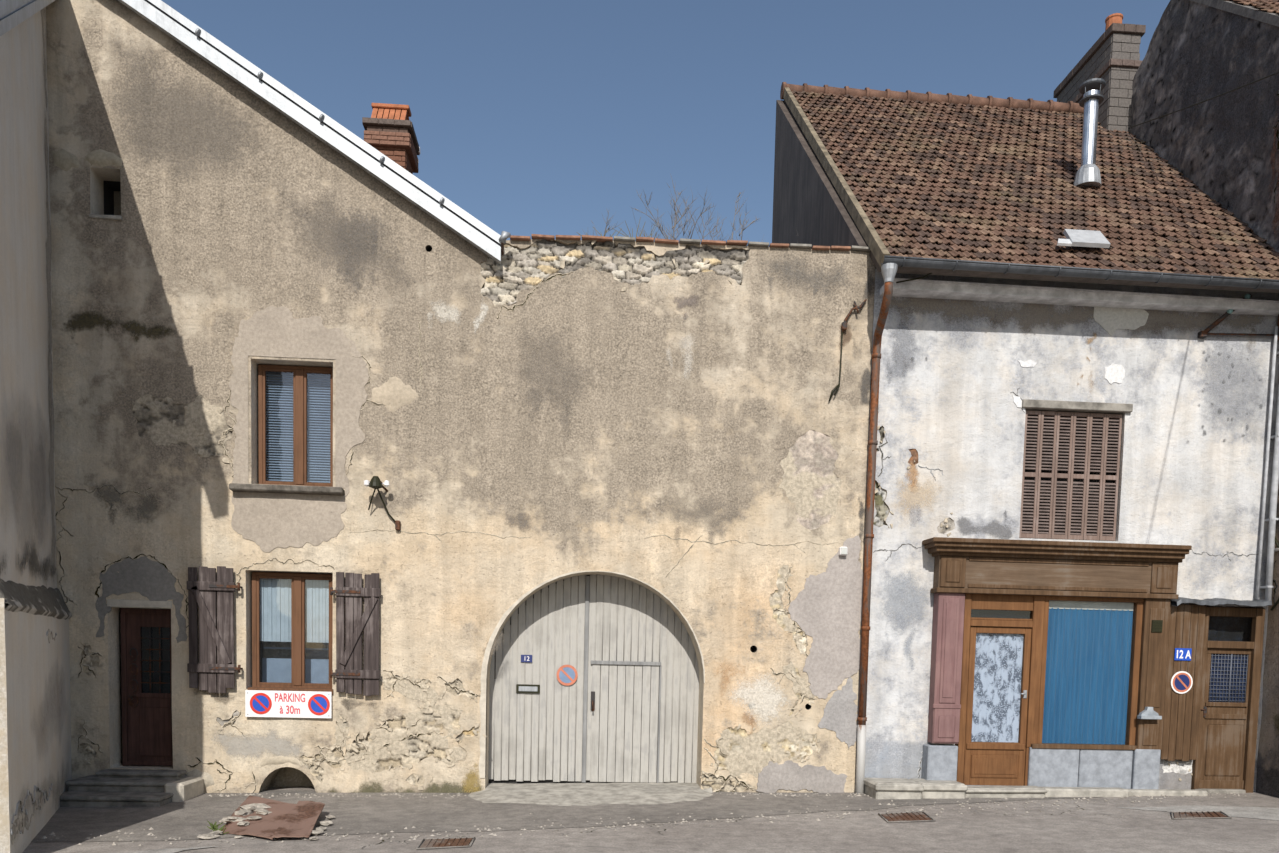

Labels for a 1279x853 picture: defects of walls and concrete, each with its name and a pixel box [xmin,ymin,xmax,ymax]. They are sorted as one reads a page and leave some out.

flaking render [480,239,750,307]
flaking render [132,394,233,463]
spalling [907,449,918,469]
corrosion [908,462,917,492]
spalling [873,480,893,528]
crack [349,529,531,542]
flaking render [300,672,487,790]